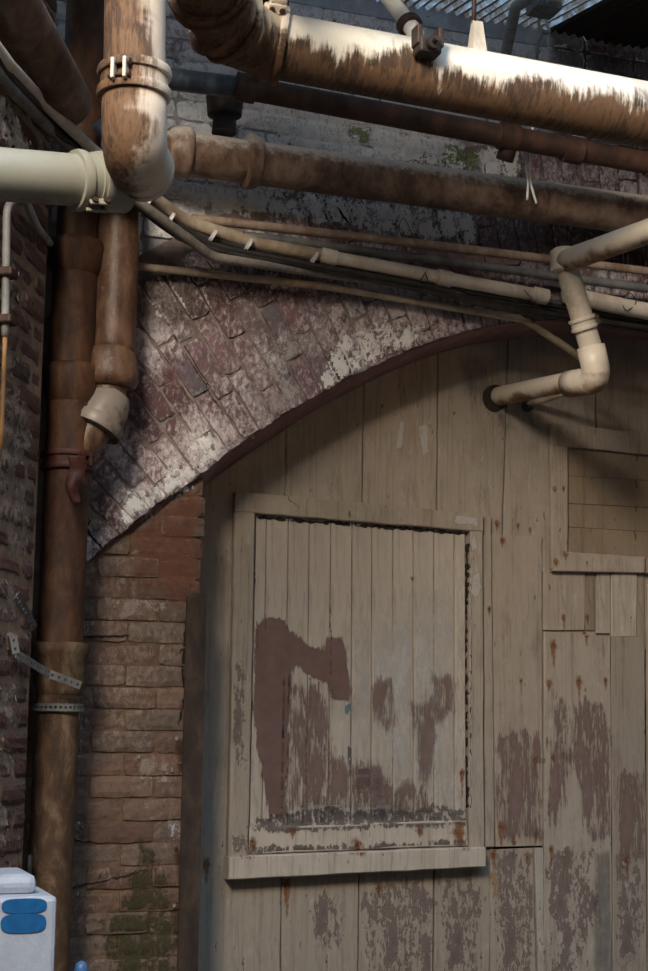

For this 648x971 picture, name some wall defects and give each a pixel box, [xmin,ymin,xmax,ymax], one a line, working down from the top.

peeling [120,320,440,524]
peeling [232,615,467,859]
peeling [361,696,646,971]